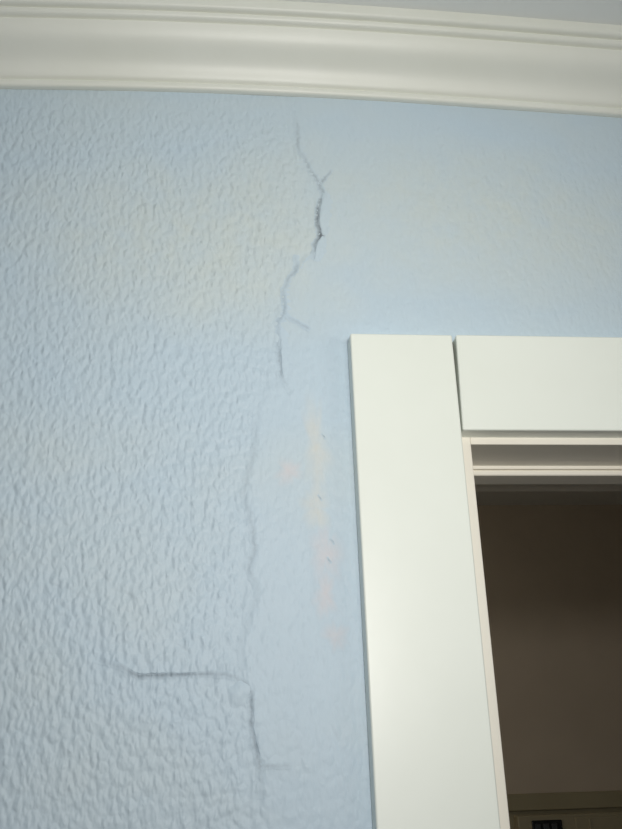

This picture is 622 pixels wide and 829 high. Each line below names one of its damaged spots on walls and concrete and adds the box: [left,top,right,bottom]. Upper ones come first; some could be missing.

crack [275,111,333,394]
crack [94,657,292,799]